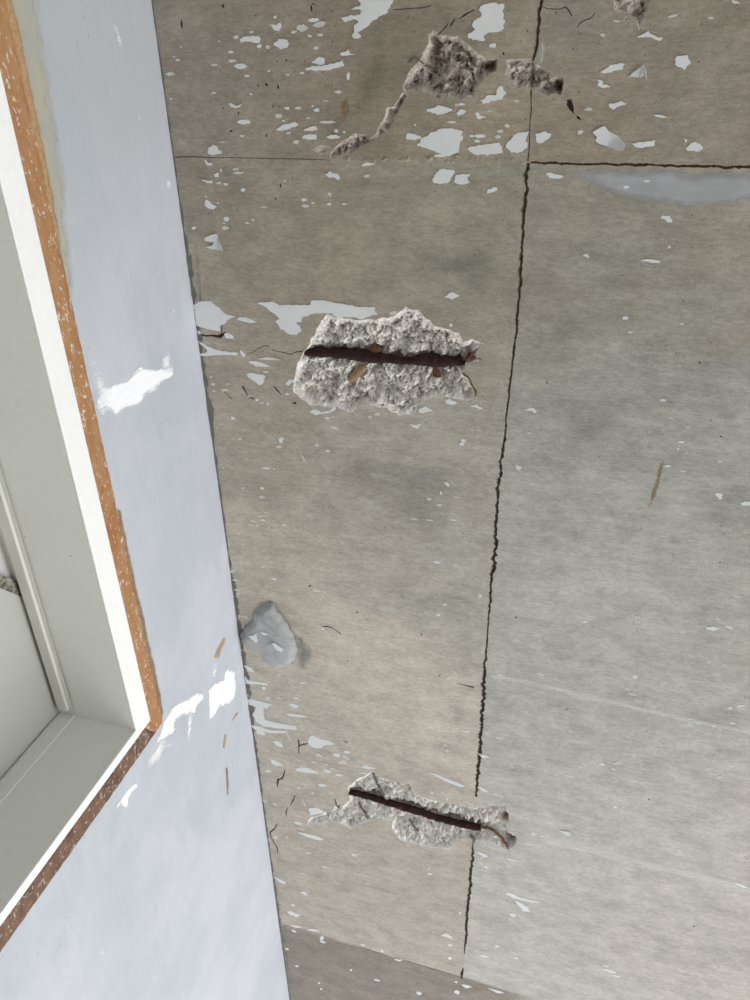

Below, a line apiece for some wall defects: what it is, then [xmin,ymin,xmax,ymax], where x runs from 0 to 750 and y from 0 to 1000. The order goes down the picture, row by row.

peeling [228,3,354,95]
spalling [266,0,655,158]
crack [531,0,595,61]
peeling [684,139,703,152]
spalling [258,300,484,430]
crack [458,90,532,797]
spalling [273,735,521,869]
crack [460,846,475,979]